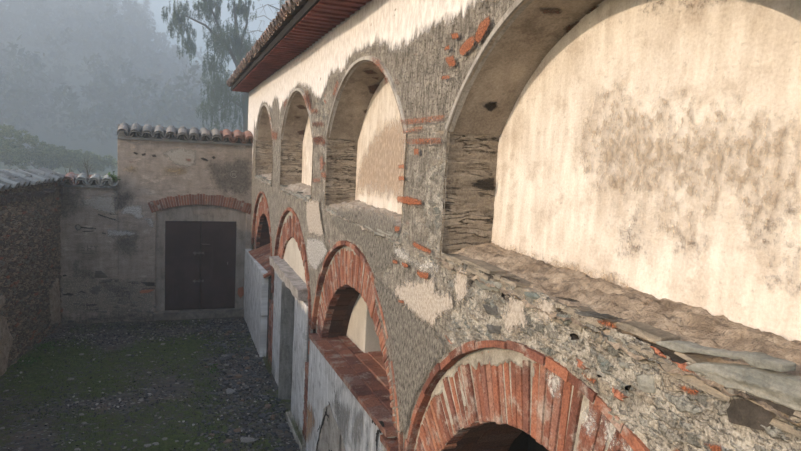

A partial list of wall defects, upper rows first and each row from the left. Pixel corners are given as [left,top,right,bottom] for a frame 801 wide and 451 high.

spalling [364,58,388,94]
flaking render [442,15,490,79]
leakage [582,93,795,244]
spalling [574,311,627,329]
spalling [656,340,801,430]
crack [316,391,335,451]